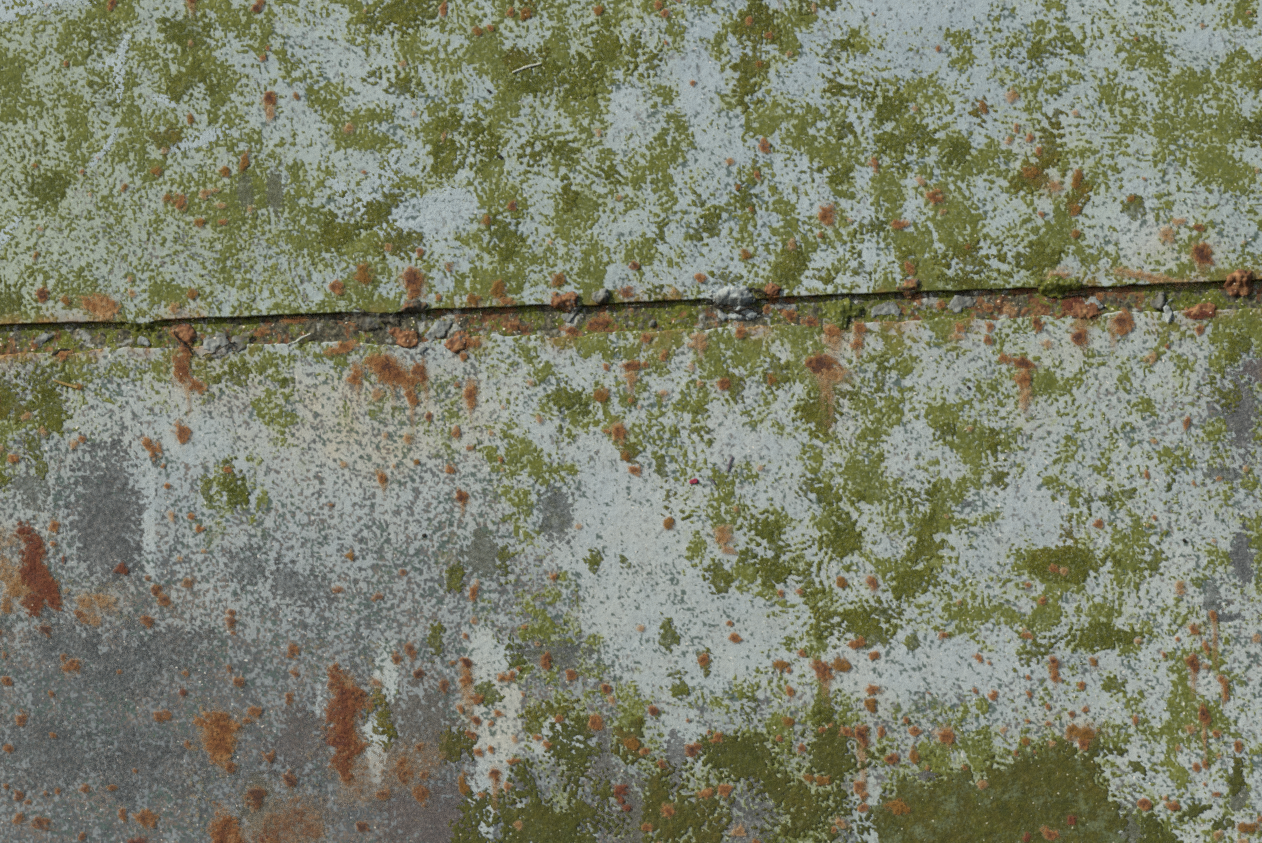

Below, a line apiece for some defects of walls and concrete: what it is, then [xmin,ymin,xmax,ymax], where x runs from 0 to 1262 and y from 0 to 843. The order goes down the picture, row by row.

crack [174,330,235,357]
corrosion [324,340,432,422]
corrosion [466,279,516,306]
crack [714,287,767,316]
corrosion [763,292,867,410]
corrosion [1185,310,1214,336]
corrosion [376,464,396,488]
corrosion [0,521,117,637]
corrosion [184,706,261,773]
corrosion [321,663,443,807]